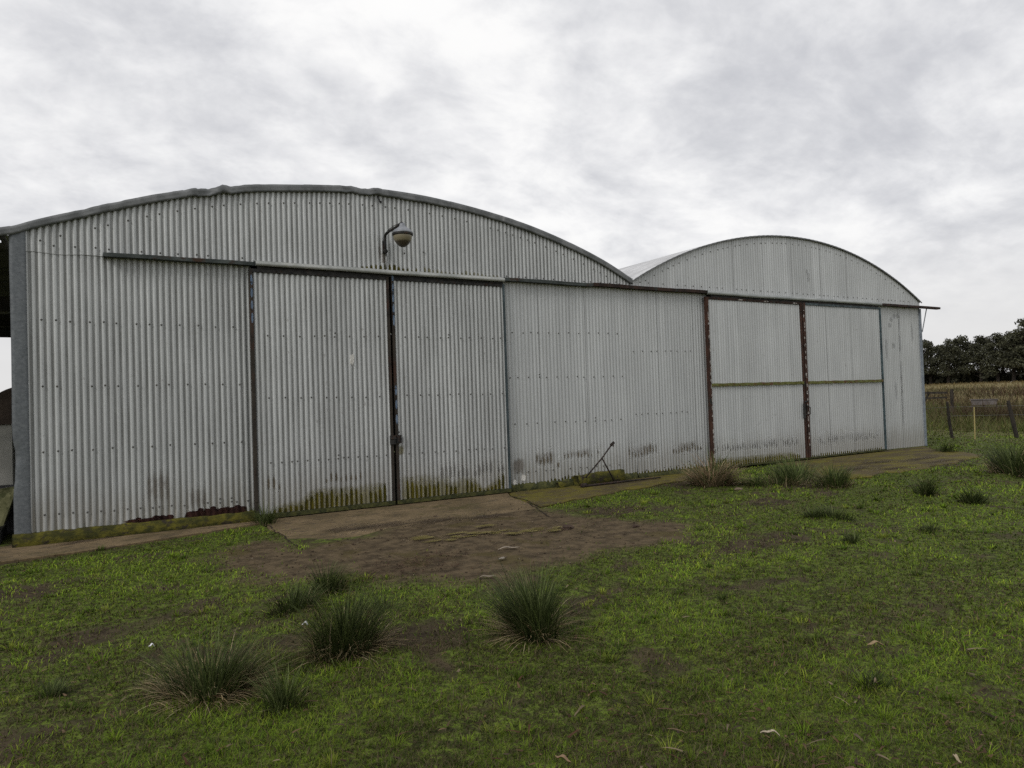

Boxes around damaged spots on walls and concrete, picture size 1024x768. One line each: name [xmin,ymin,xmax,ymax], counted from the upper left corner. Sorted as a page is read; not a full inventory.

rust [124,505,247,523]